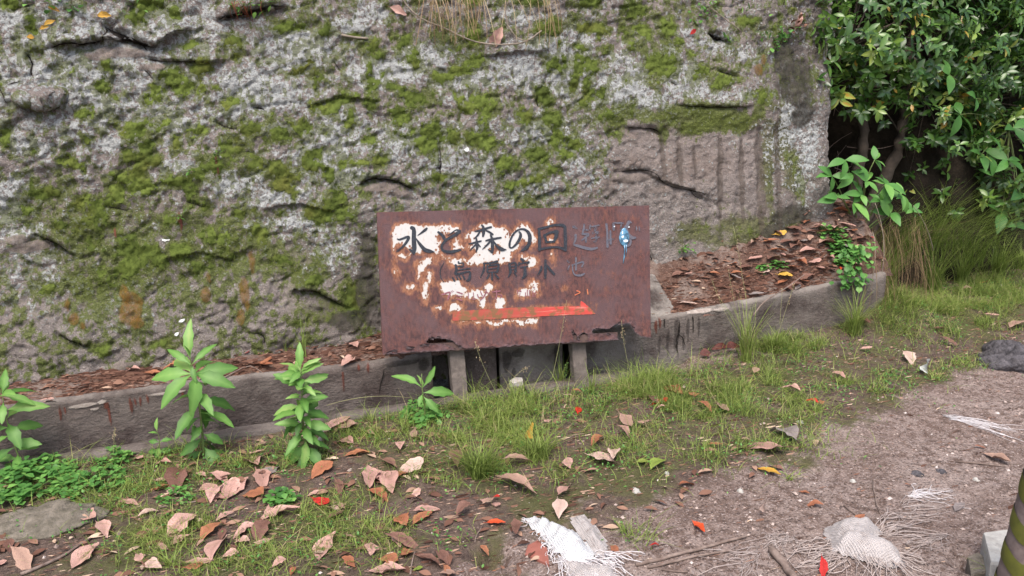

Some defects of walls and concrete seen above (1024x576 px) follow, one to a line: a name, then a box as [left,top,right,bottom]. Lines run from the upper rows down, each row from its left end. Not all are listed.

crack [0,27,203,105]
crack [617,169,714,203]